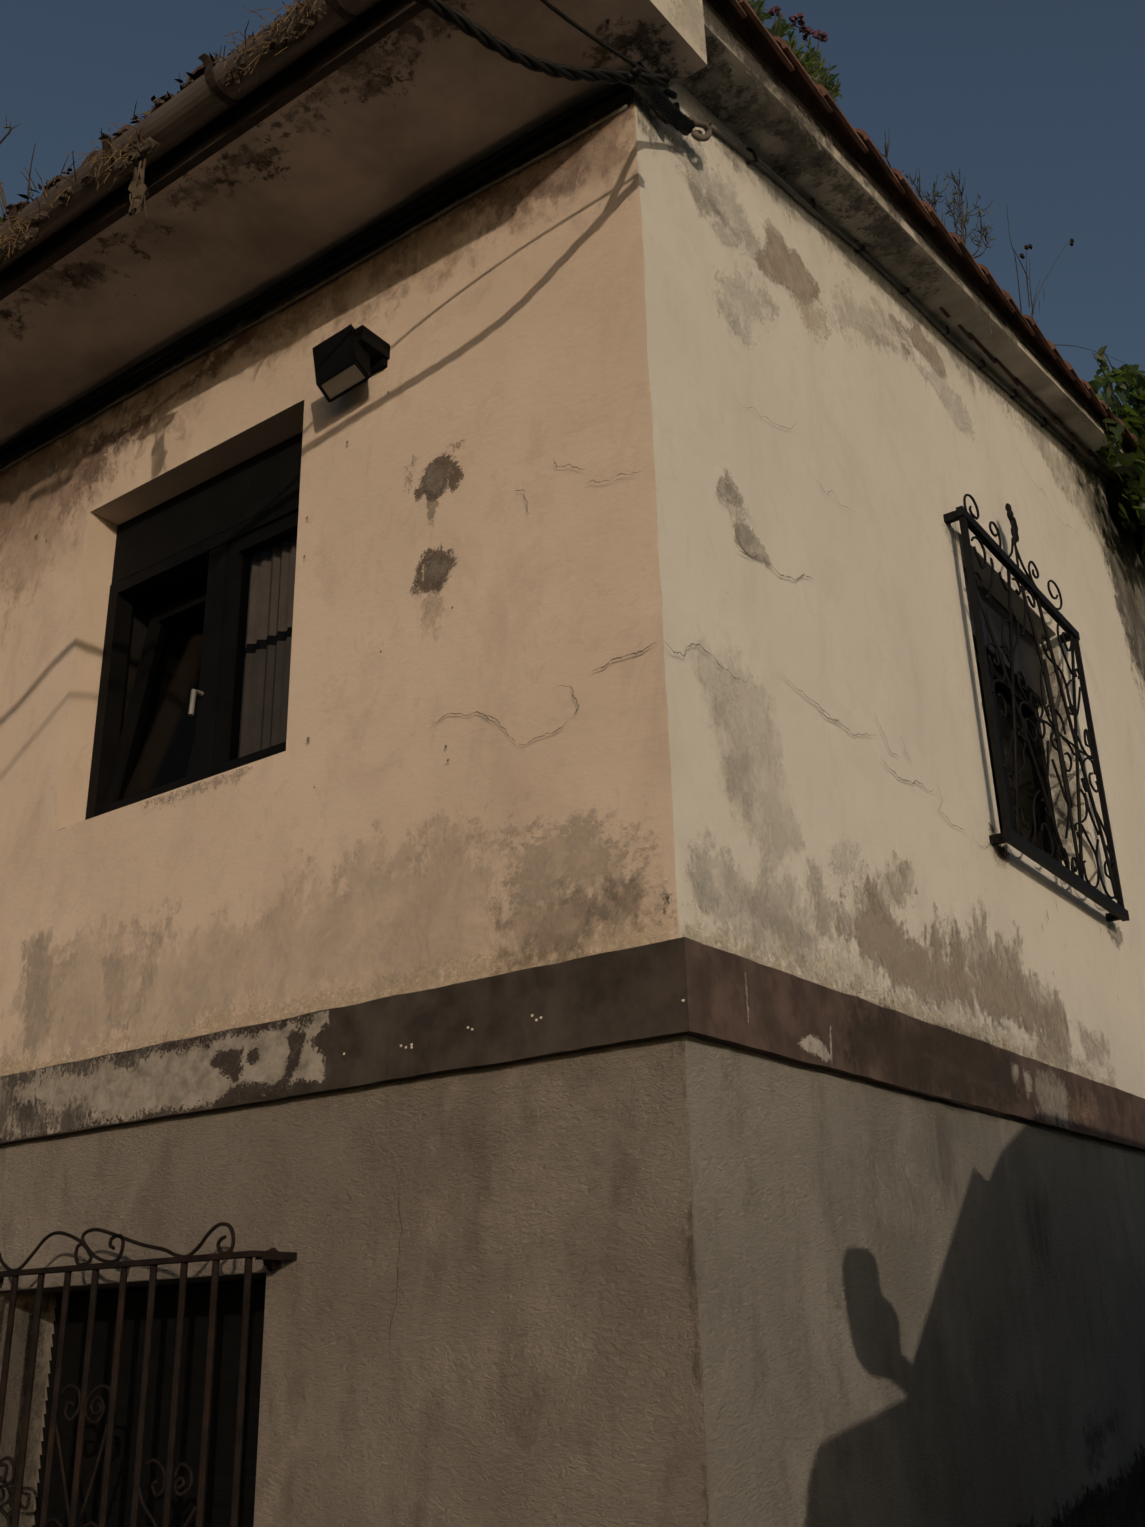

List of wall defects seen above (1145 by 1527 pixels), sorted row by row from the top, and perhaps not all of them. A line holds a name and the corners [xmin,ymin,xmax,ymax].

flaking render [665,124,947,380]
damp [682,1,1019,352]
flaking render [410,546,457,595]
flaking render [405,439,465,524]
flaking render [717,469,772,569]
crack [432,641,749,746]
crack [788,680,1004,854]
peeling [0,1010,330,1142]
damp [0,816,1117,1108]
peeling [752,889,1102,1138]